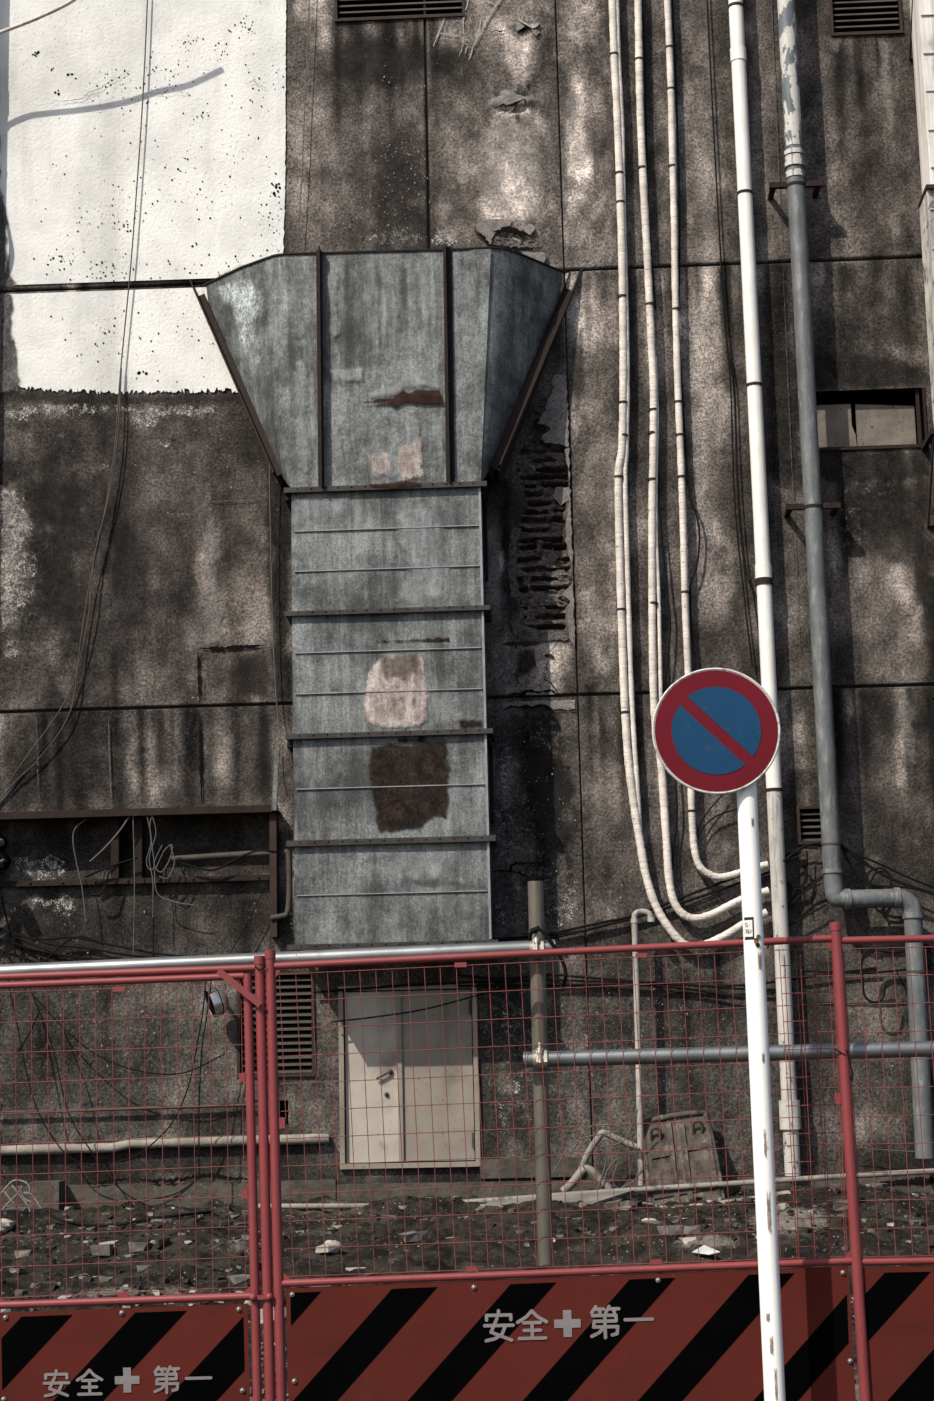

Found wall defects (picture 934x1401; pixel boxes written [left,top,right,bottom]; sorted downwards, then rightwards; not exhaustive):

damp [51,15,255,160]
damp [496,81,537,121]
damp [52,129,243,236]
damp [33,173,291,286]
damp [367,132,459,247]
damp [0,457,107,658]
spalling [508,375,575,658]